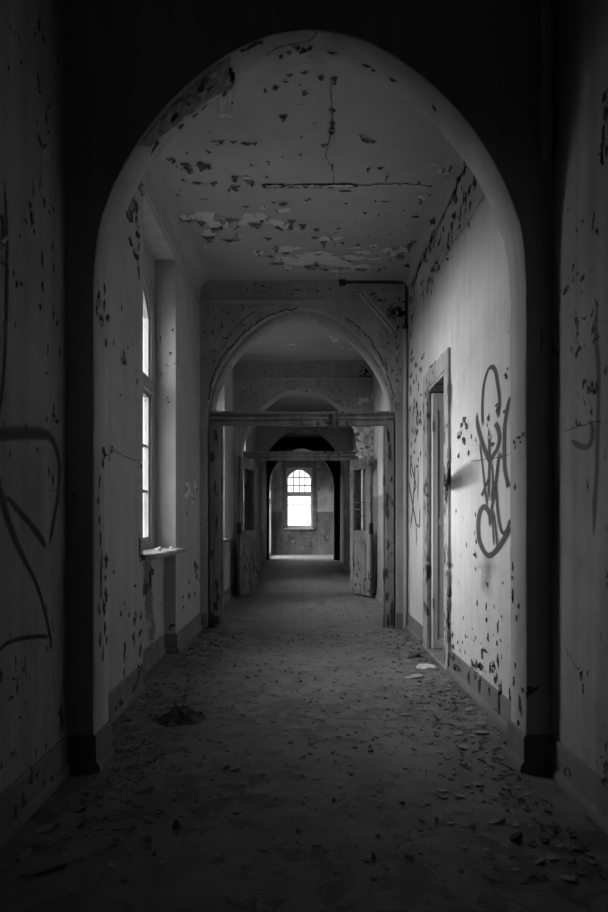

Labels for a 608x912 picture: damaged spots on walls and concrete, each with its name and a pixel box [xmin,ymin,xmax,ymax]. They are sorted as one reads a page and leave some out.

flaking render [139,40,264,155]
flaking render [179,161,477,468]
flaking render [120,533,156,693]
peeling [394,545,539,749]